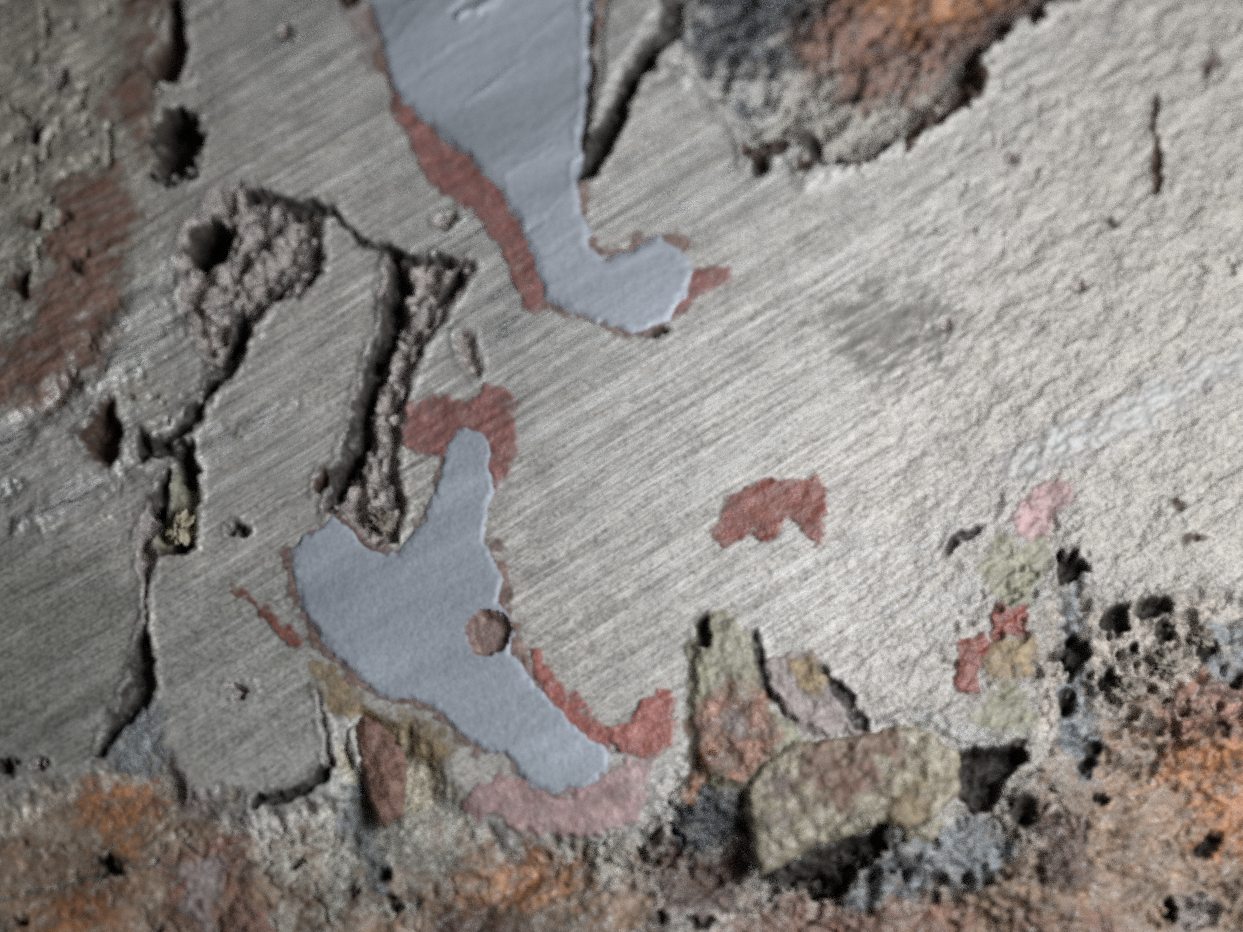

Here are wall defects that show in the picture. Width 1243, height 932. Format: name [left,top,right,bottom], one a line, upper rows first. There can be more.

spalling [29,126,42,145]
spalling [145,0,190,89]
spalling [148,106,207,188]
peeling [340,0,732,339]
crack [578,0,686,183]
rust [662,0,1051,172]
spalling [7,269,30,300]
crack [74,391,214,758]
peeling [174,181,677,839]
rust [0,559,1243,932]
peeling [742,726,961,877]
hole [1005,793,1039,829]